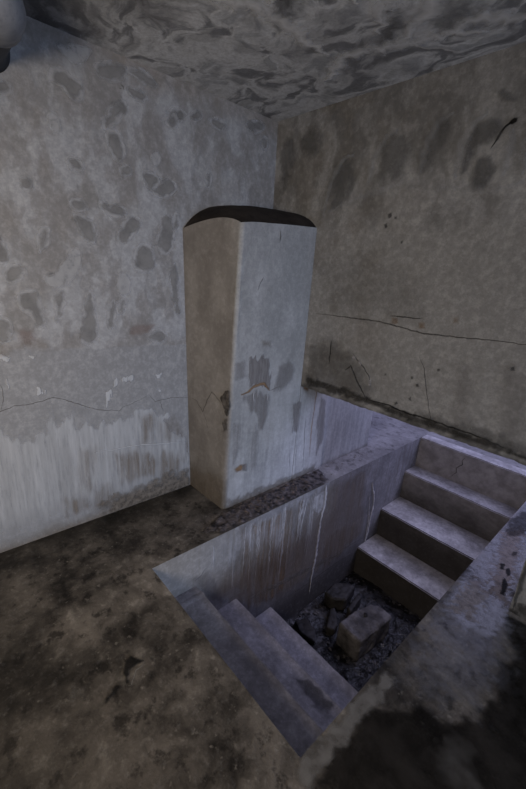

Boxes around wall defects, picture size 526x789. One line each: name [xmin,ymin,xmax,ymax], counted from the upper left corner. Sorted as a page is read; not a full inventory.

crack [491,118,517,148]
crack [326,314,526,345]
peeling [0,408,188,530]
damp [290,486,327,592]
damp [315,618,526,789]